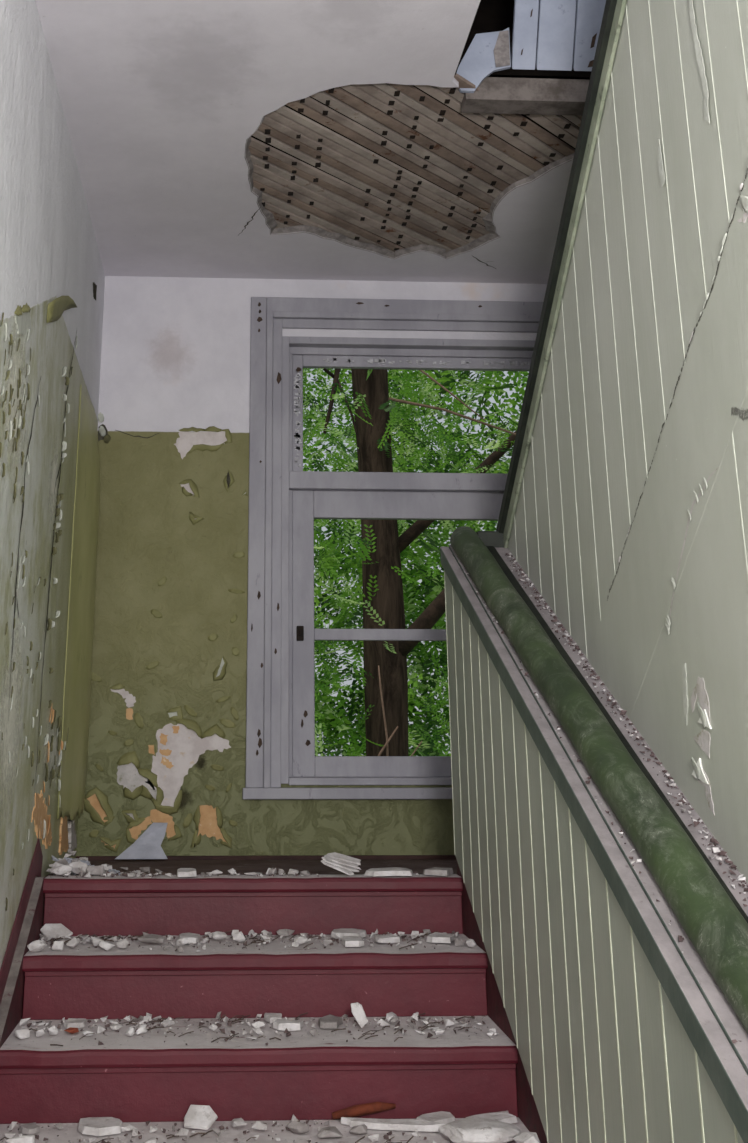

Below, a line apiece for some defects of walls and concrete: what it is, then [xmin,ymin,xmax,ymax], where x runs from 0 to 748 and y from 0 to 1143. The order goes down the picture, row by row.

spalling [245,73,582,259]
peeling [0,303,31,504]
peeling [50,441,67,555]
peeling [47,296,77,323]
peeling [174,426,232,459]
crack [609,166,748,593]
spalling [665,467,719,635]
peeling [0,550,77,855]
peeling [110,683,136,720]
peeling [84,706,232,849]
peeling [213,656,227,681]
peeling [682,663,715,816]